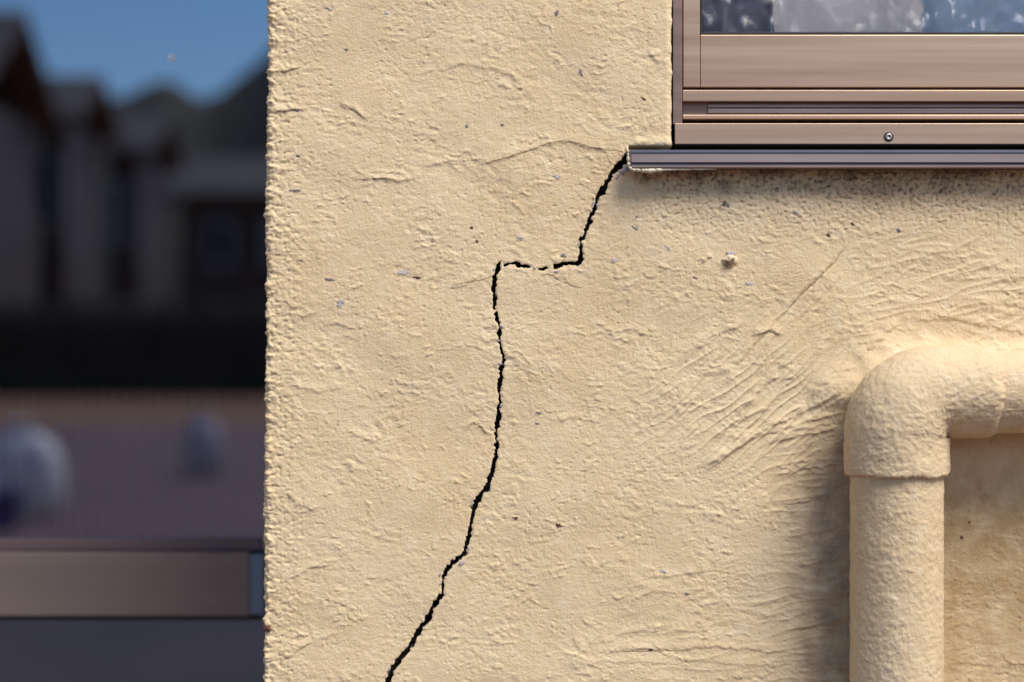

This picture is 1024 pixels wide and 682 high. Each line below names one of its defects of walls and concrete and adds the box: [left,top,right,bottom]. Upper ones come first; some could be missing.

crack [385,141,629,682]